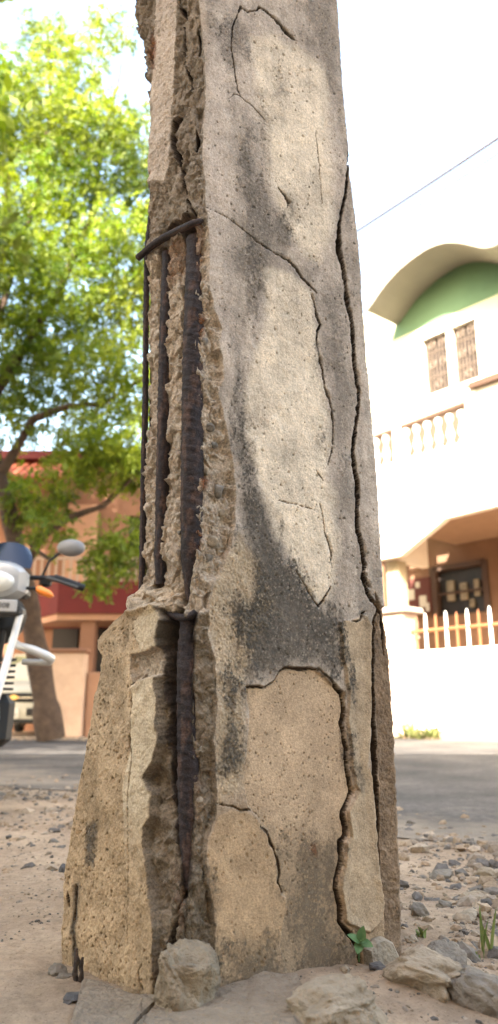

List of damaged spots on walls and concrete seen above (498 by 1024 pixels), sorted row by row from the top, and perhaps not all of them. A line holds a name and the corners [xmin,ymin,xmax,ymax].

peeling [130,0,402,981]
crack [171,5,384,863]
damp [216,379,356,778]